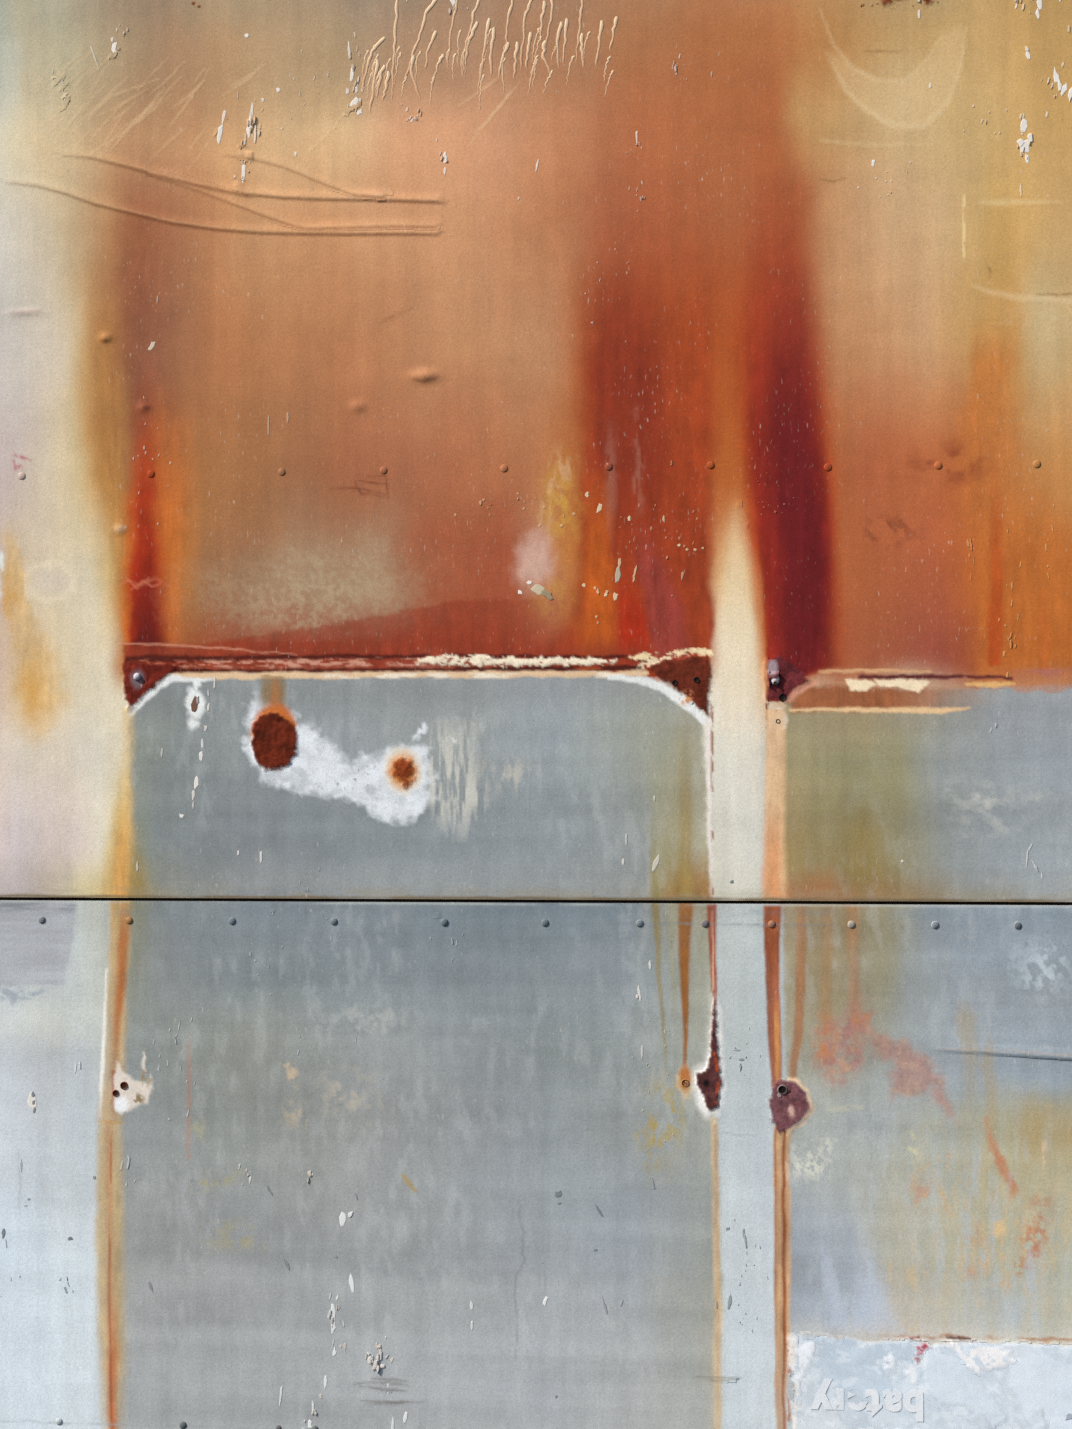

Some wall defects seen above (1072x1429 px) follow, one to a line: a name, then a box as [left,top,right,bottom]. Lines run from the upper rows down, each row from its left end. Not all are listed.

peeling [346,32,364,117]
corrosion [860,0,938,10]
corrosion [87,123,1072,895]
corrosion [91,901,151,1429]
peeling [0,582,1072,1429]
corrosion [633,905,729,1429]
corrosion [761,909,960,1429]
corrosion [866,1331,1072,1345]
corrosion [961,1216,992,1282]
corrosion [1004,1092,1072,1274]